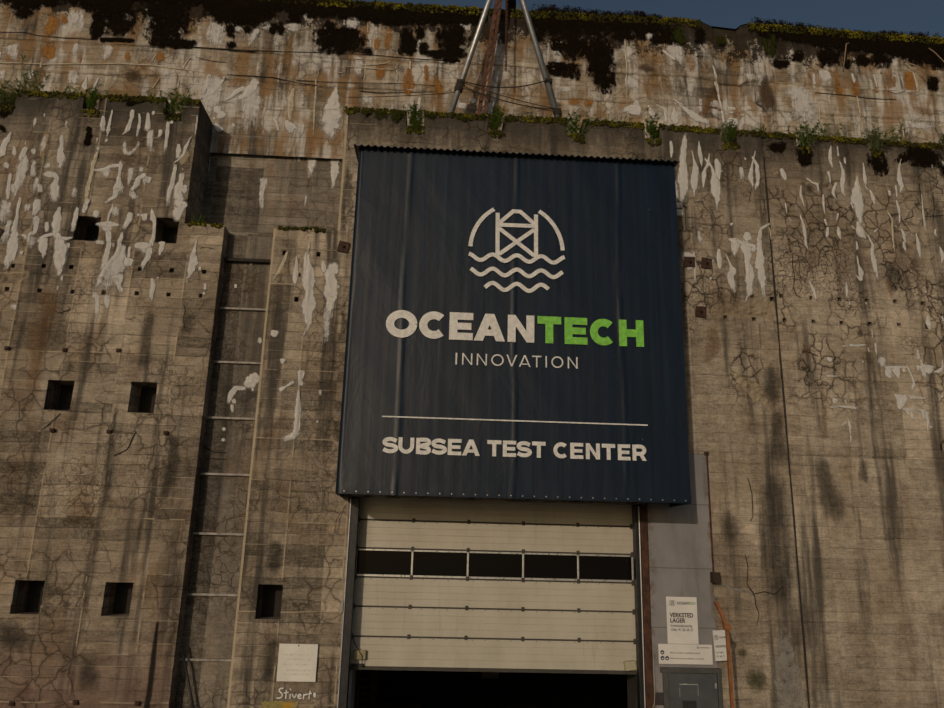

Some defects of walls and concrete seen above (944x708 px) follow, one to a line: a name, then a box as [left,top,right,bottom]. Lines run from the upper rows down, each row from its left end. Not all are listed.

water stain [273,78,344,138]
rust [873,72,919,97]
water stain [0,43,263,318]
water stain [273,242,340,341]
water stain [712,223,772,301]
water stain [739,151,760,190]
water stain [785,146,878,305]
water stain [887,160,944,263]
crack [902,179,943,220]
water stain [227,373,259,412]
water stain [842,331,944,431]
crack [745,555,783,626]